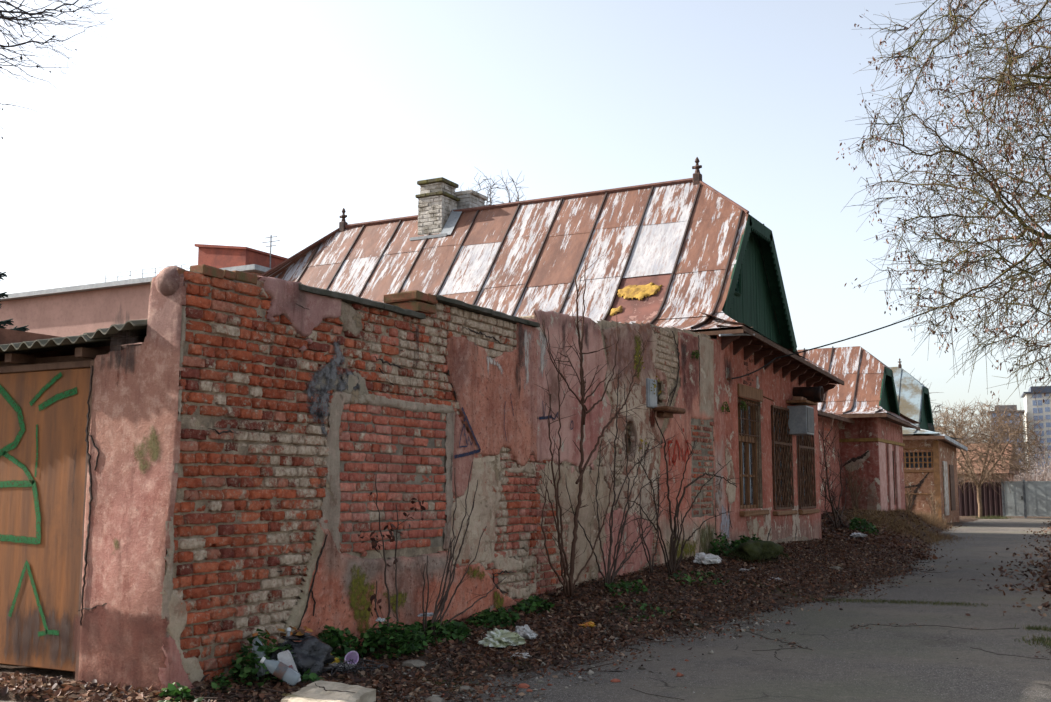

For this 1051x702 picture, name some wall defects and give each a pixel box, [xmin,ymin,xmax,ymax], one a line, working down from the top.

spalling [160,272,517,683]
peeling [451,322,679,603]